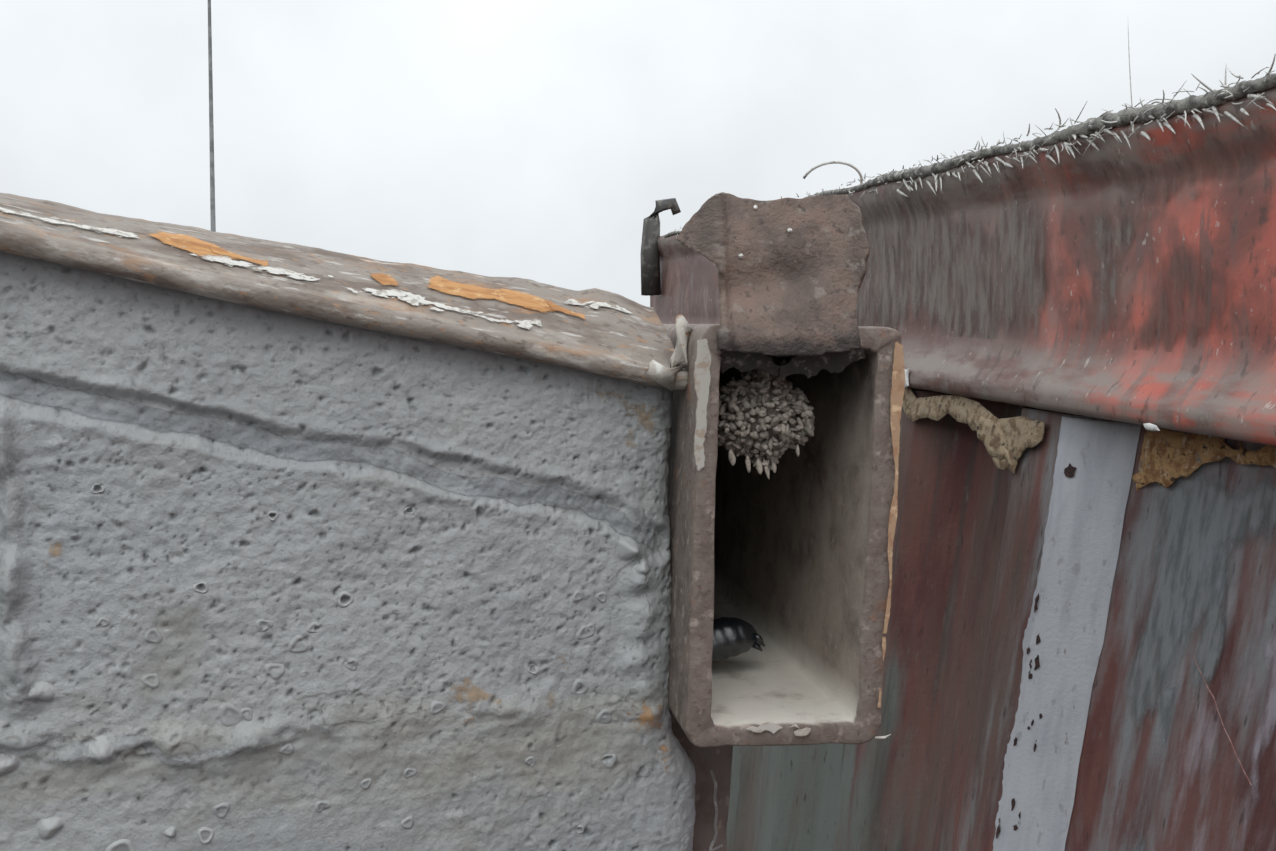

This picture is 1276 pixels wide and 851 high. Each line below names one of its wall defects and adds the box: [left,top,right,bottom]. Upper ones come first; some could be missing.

rust [150,231,268,266]
rust [428,276,586,319]
peeling [969,415,1012,468]
crack [616,509,650,658]
crack [293,687,443,737]
crack [3,733,234,763]